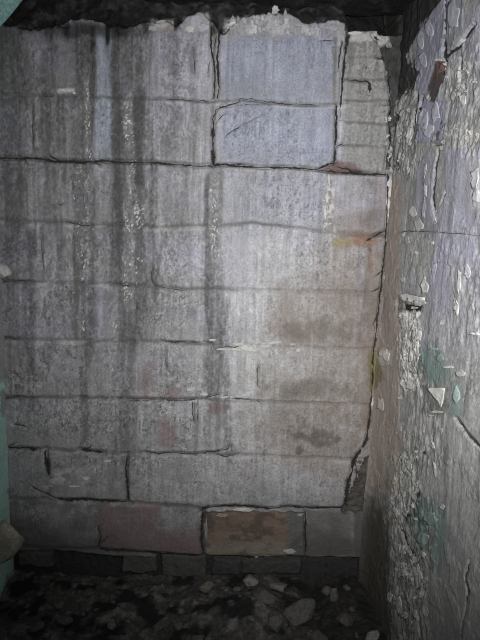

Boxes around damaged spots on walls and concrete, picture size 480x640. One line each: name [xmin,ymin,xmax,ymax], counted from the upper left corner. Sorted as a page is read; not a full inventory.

water stain [113,101,144,306]
crack [0,26,393,560]
water stain [369,351,381,388]
peeling [377,18,480,417]
peeling [386,421,445,640]